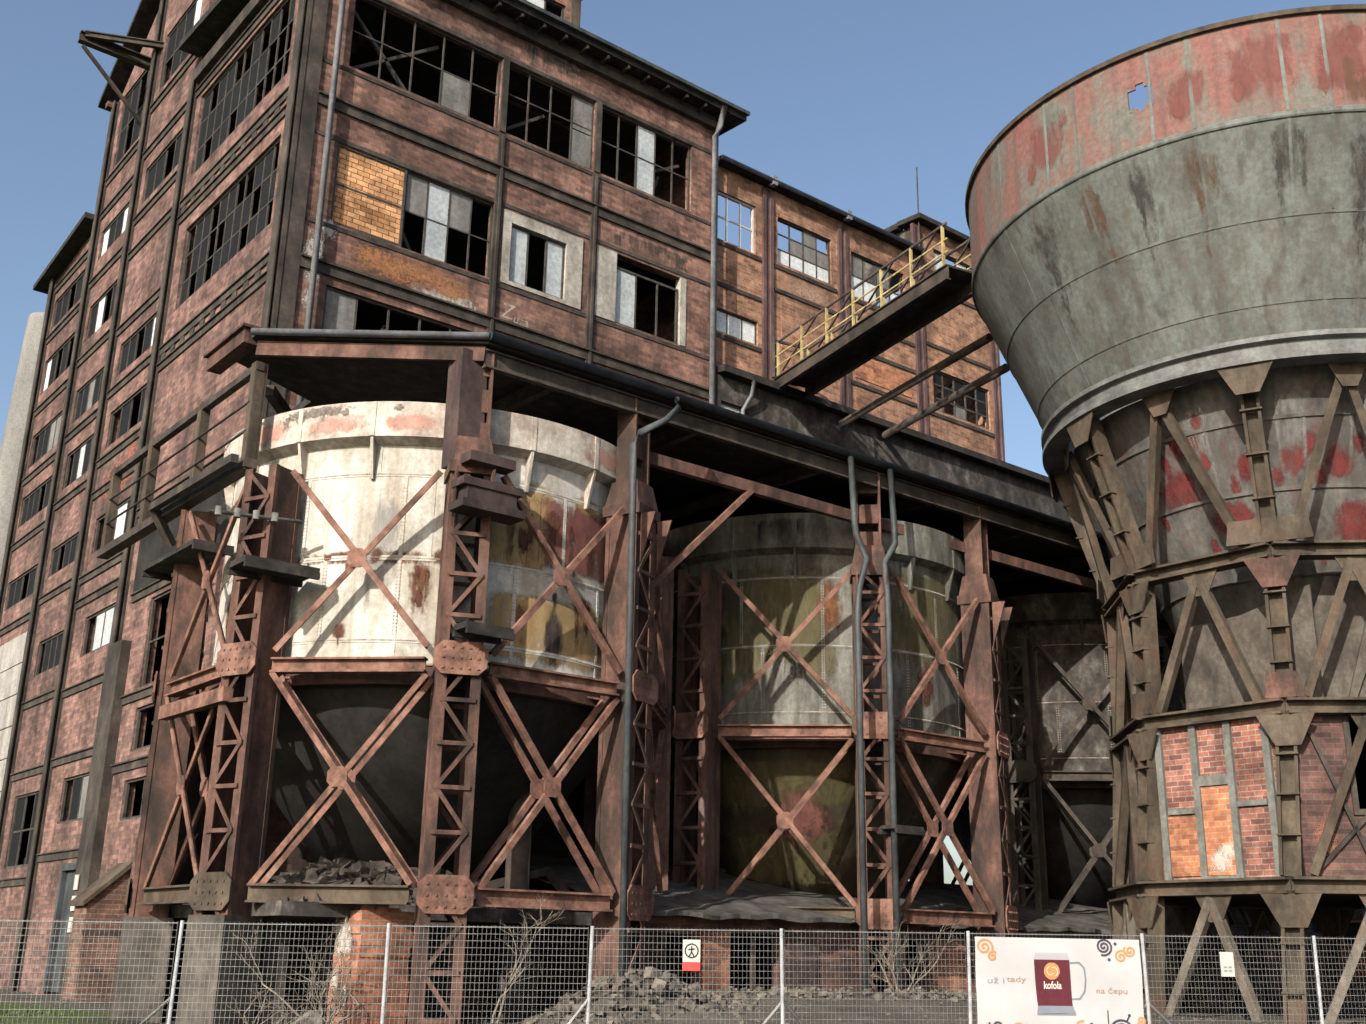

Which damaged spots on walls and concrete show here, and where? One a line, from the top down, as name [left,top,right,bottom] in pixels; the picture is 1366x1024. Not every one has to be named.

leakage [1272,126,1306,202]
leakage [1129,167,1151,226]
spalling [260,405,363,445]
peeling [387,404,434,430]
rust [488,484,546,570]
rust [576,498,599,516]
rust [297,551,349,570]
rust [366,548,441,609]
rust [486,593,603,675]
leakage [766,659,798,686]